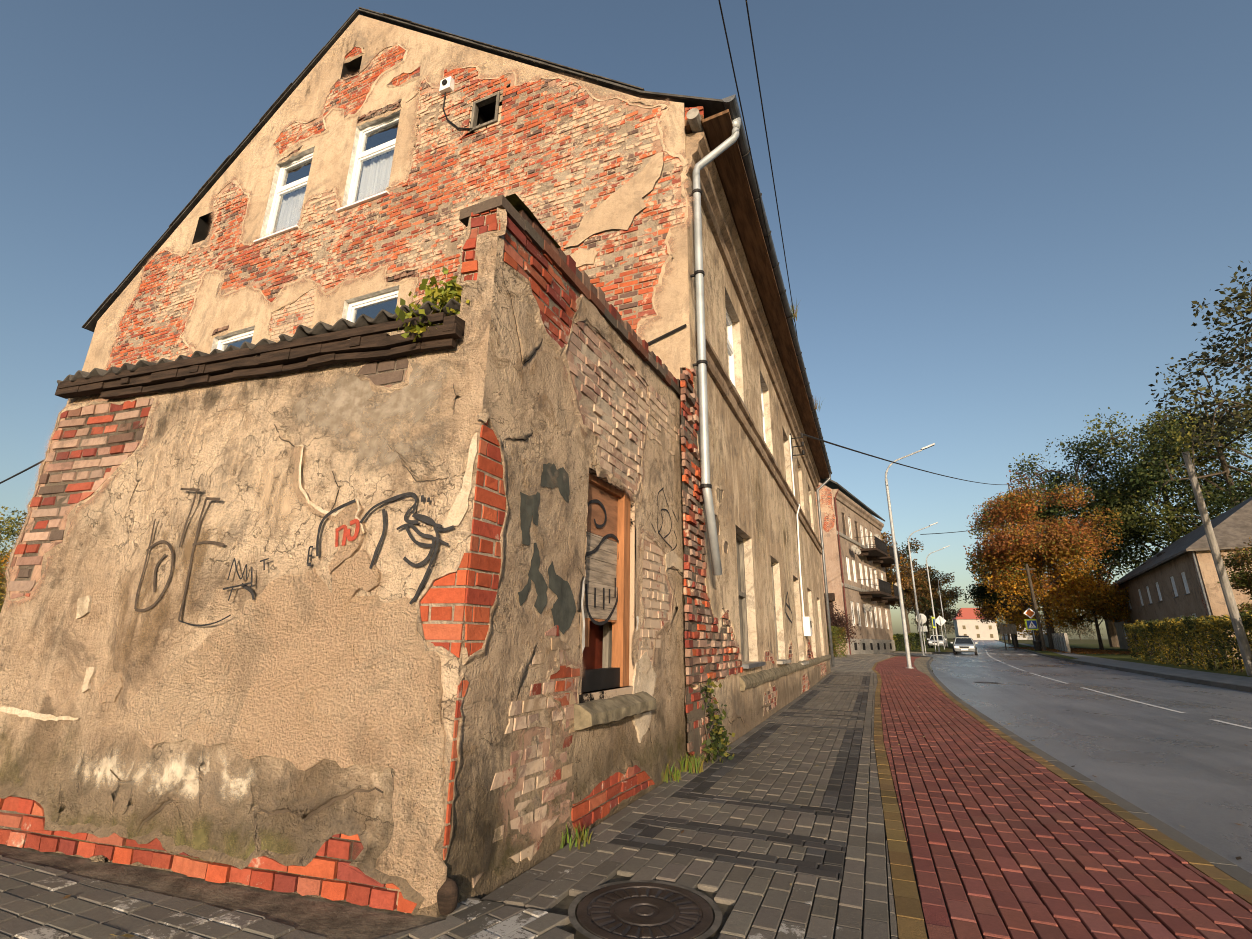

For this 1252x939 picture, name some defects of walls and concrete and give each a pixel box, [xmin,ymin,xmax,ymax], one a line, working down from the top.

efflorescence [75,755,251,796]
peeling [0,393,509,915]
spalling [106,43,743,760]
peeling [472,578,655,888]